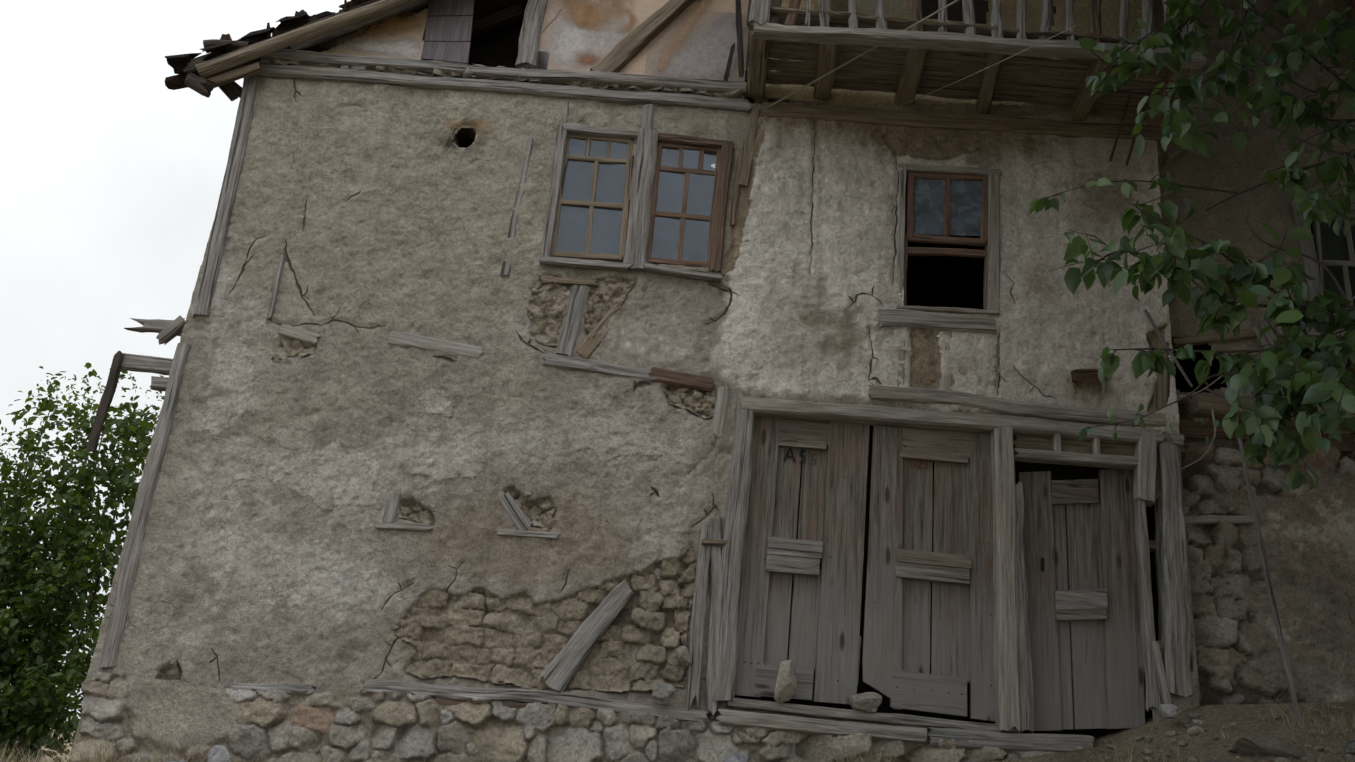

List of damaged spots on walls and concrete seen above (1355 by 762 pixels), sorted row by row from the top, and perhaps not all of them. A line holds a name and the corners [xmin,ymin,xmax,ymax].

damp [549,11,624,67]
crack [229,198,382,361]